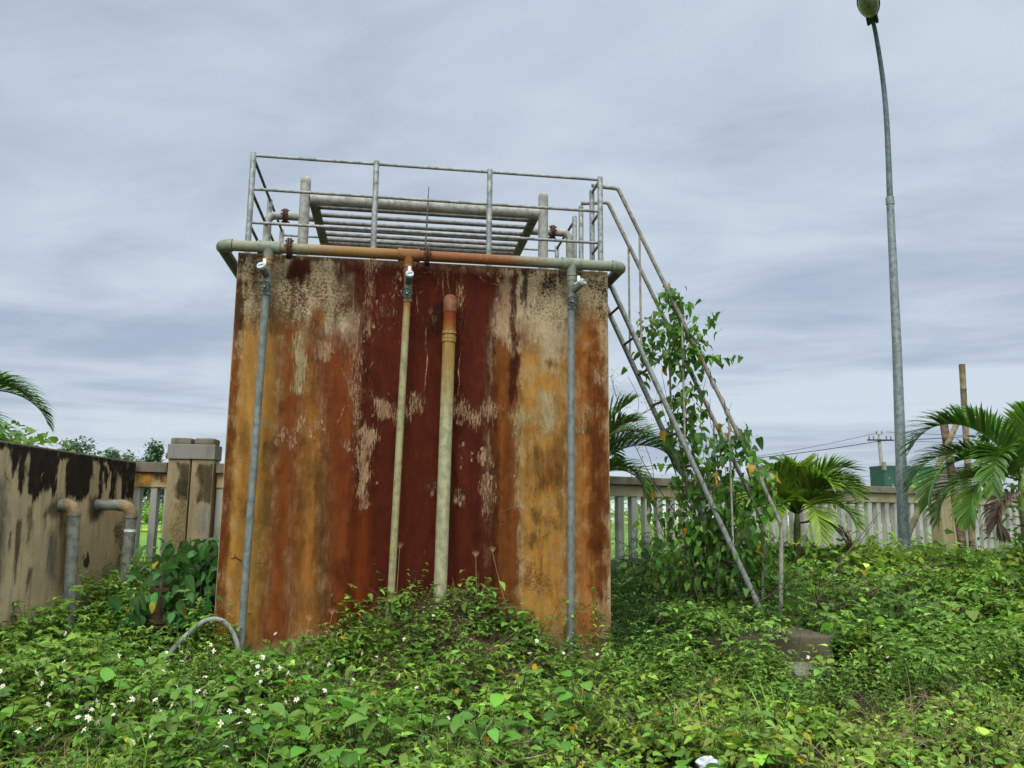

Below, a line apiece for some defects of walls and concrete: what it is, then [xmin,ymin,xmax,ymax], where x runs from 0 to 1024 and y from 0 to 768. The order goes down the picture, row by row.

peeling [289,260,425,510]
water stain [0,442,136,521]
water stain [171,462,213,547]
corrosion [214,257,610,651]
peeling [460,442,496,515]
peeling [453,387,561,489]